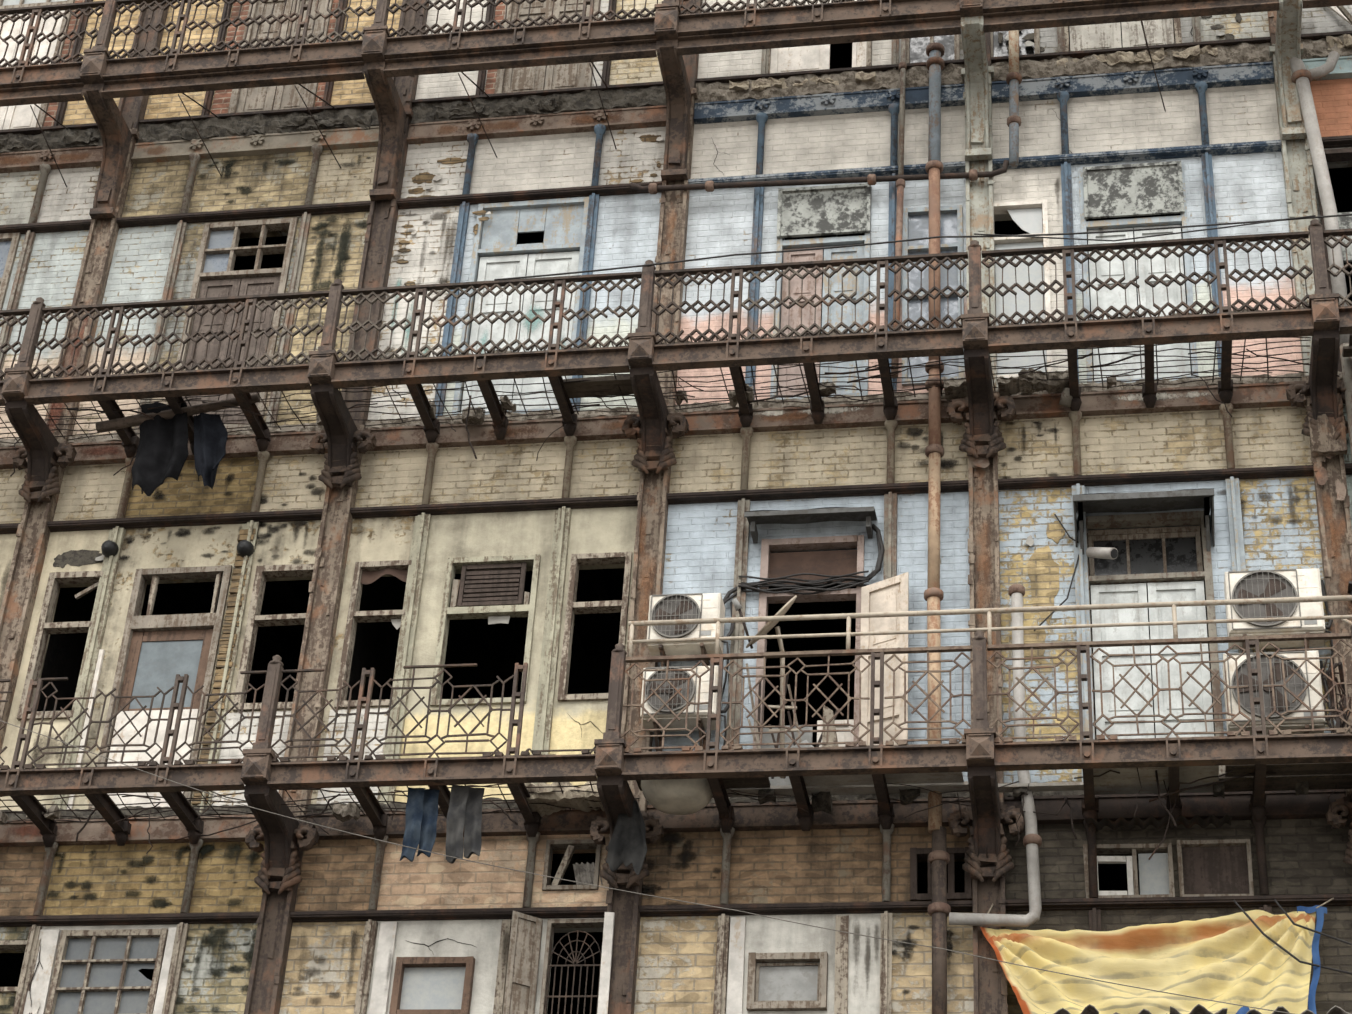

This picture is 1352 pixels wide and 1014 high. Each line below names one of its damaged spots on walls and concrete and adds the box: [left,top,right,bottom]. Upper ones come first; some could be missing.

spalling [1326,34,1352,51]
spalling [64,129,101,144]
spalling [181,114,372,141]
rust [1310,446,1346,501]
mould [176,927,257,1012]